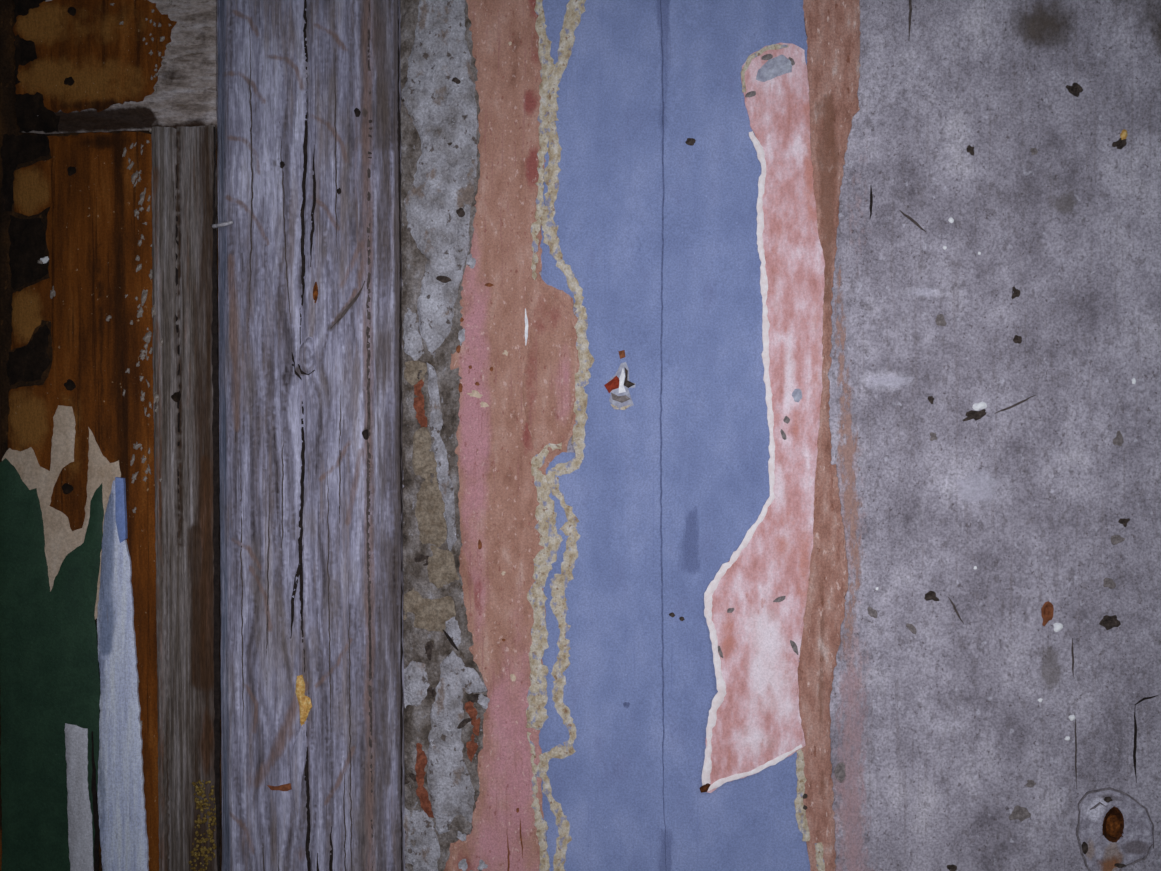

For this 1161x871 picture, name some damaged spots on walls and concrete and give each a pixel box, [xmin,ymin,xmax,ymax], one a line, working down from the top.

peeling [0,128,163,871]
peeling [13,0,177,113]
crack [173,140,181,536]
crack [211,0,403,871]
spalling [400,0,490,871]
peeling [510,0,594,871]
peeling [604,350,636,410]
peeling [699,43,849,871]